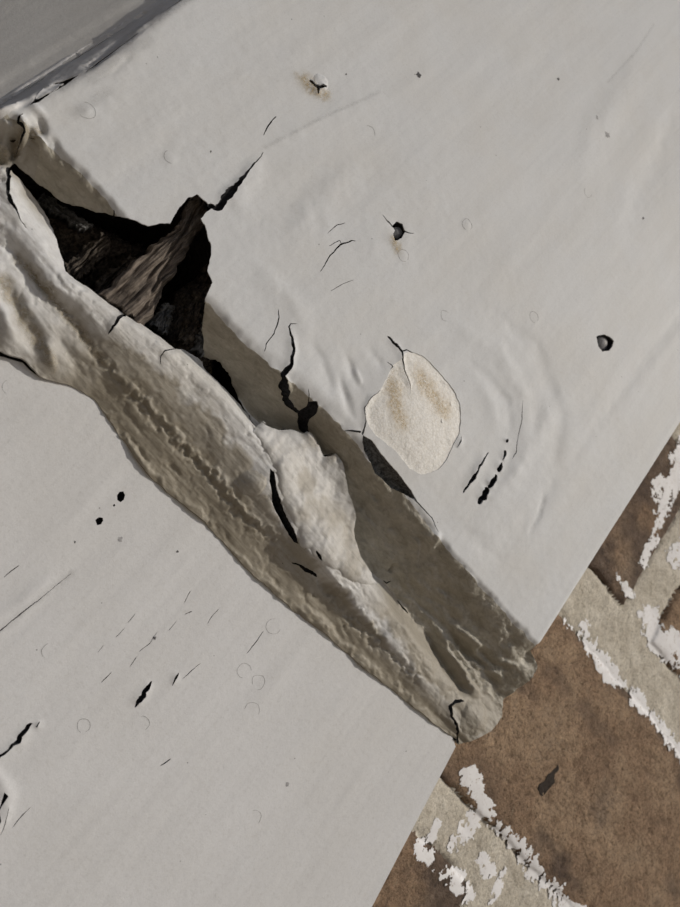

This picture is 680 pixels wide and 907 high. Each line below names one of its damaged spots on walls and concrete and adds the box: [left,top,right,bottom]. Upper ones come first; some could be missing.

spalling [10,164,210,250]
crack [207,117,276,211]
spalling [154,227,211,314]
spalling [211,360,245,411]
crack [264,310,318,433]
peeling [365,352,461,474]
crack [463,420,522,504]
crack [269,469,322,577]
crack [0,575,69,631]